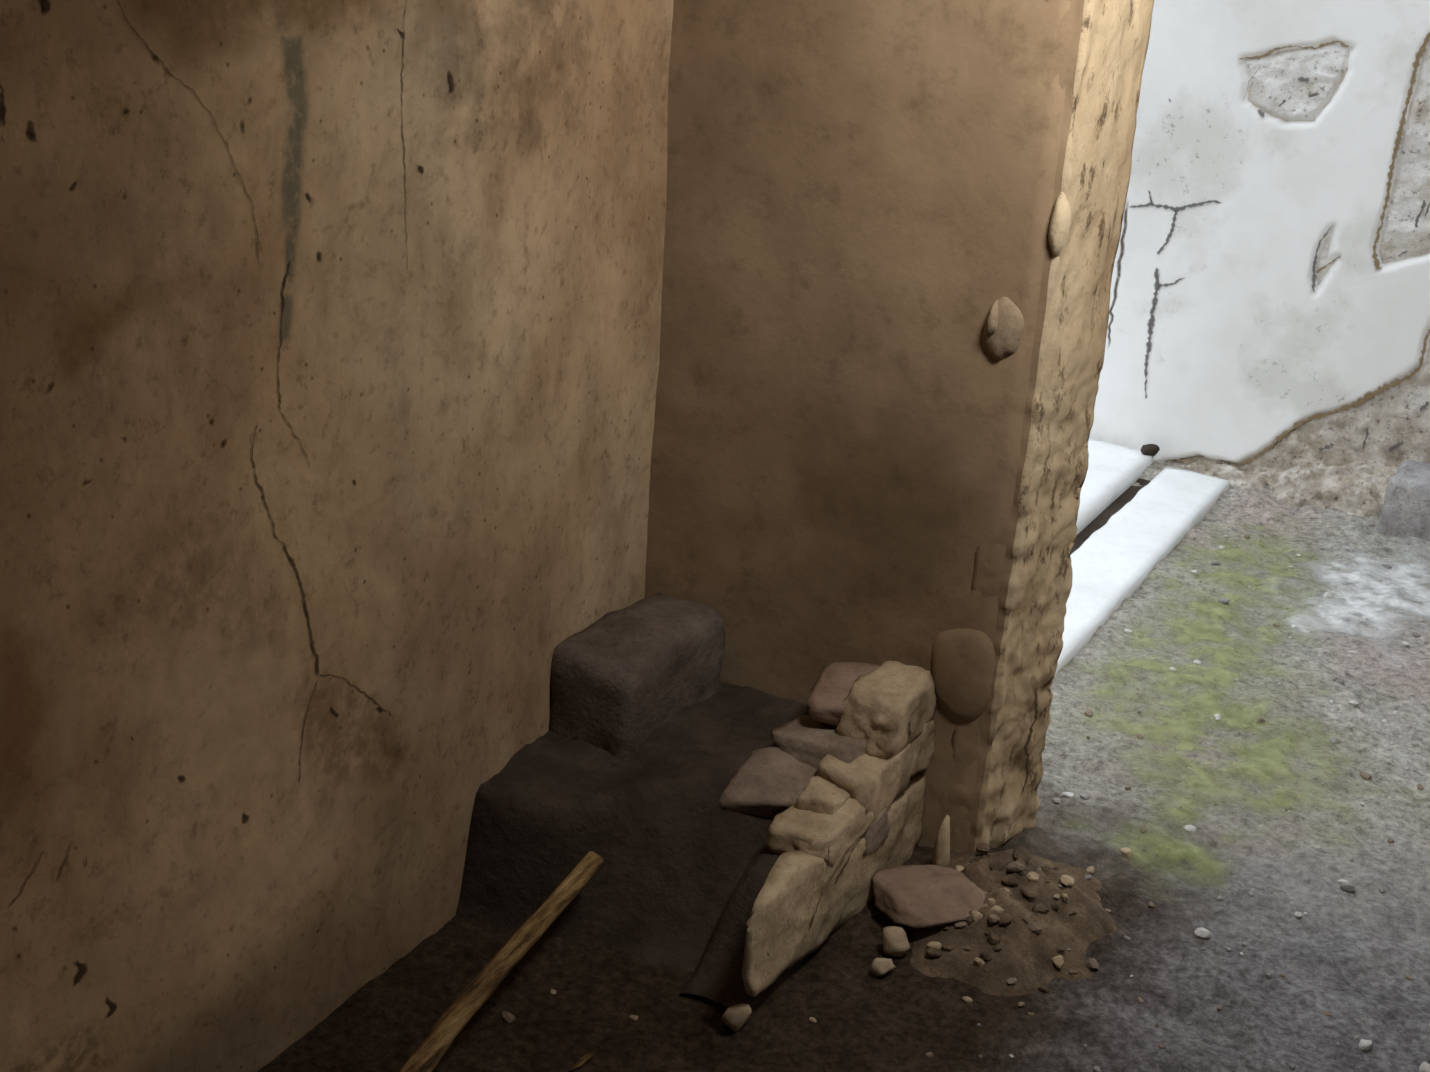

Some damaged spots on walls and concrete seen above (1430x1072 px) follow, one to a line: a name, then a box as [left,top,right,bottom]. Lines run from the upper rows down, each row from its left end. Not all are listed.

crack [120,5,390,781]
leakage [284,42,305,276]
crack [1108,191,1221,399]
spalling [1239,40,1351,121]
spalling [1183,330,1430,471]
spalling [1312,225,1340,292]
spalling [1372,33,1430,270]